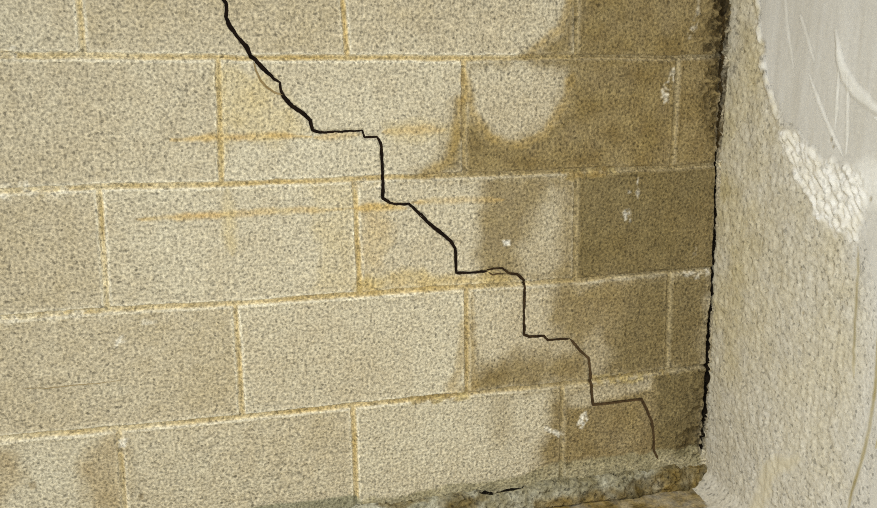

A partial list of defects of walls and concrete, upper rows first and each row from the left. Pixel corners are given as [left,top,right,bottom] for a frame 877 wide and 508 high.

crack [222,0,658,459]
leakage [395,0,731,472]
crack [699,0,726,450]